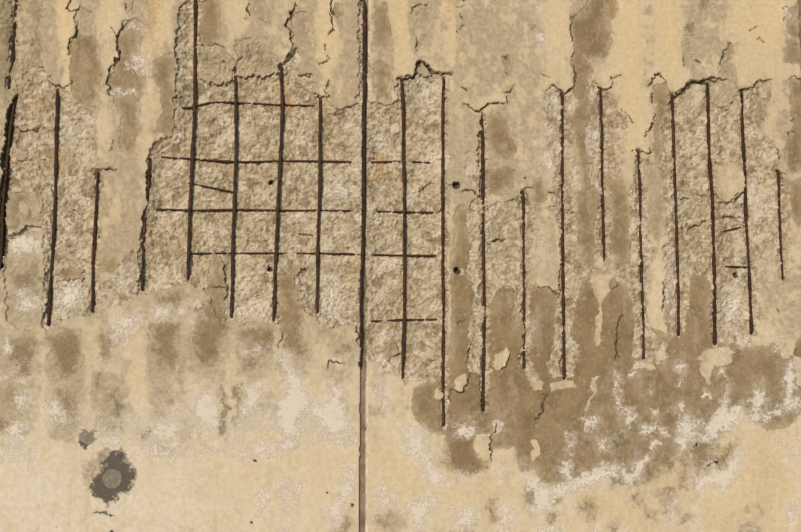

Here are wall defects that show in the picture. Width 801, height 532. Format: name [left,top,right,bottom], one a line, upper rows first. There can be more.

crack [106,3,127,96]
crack [245,2,297,61]
crack [313,0,335,98]
crack [397,38,513,113]
peeling [365,0,801,488]
damp [101,295,187,363]
damp [0,388,37,477]
damp [42,328,354,462]
damp [524,360,801,532]